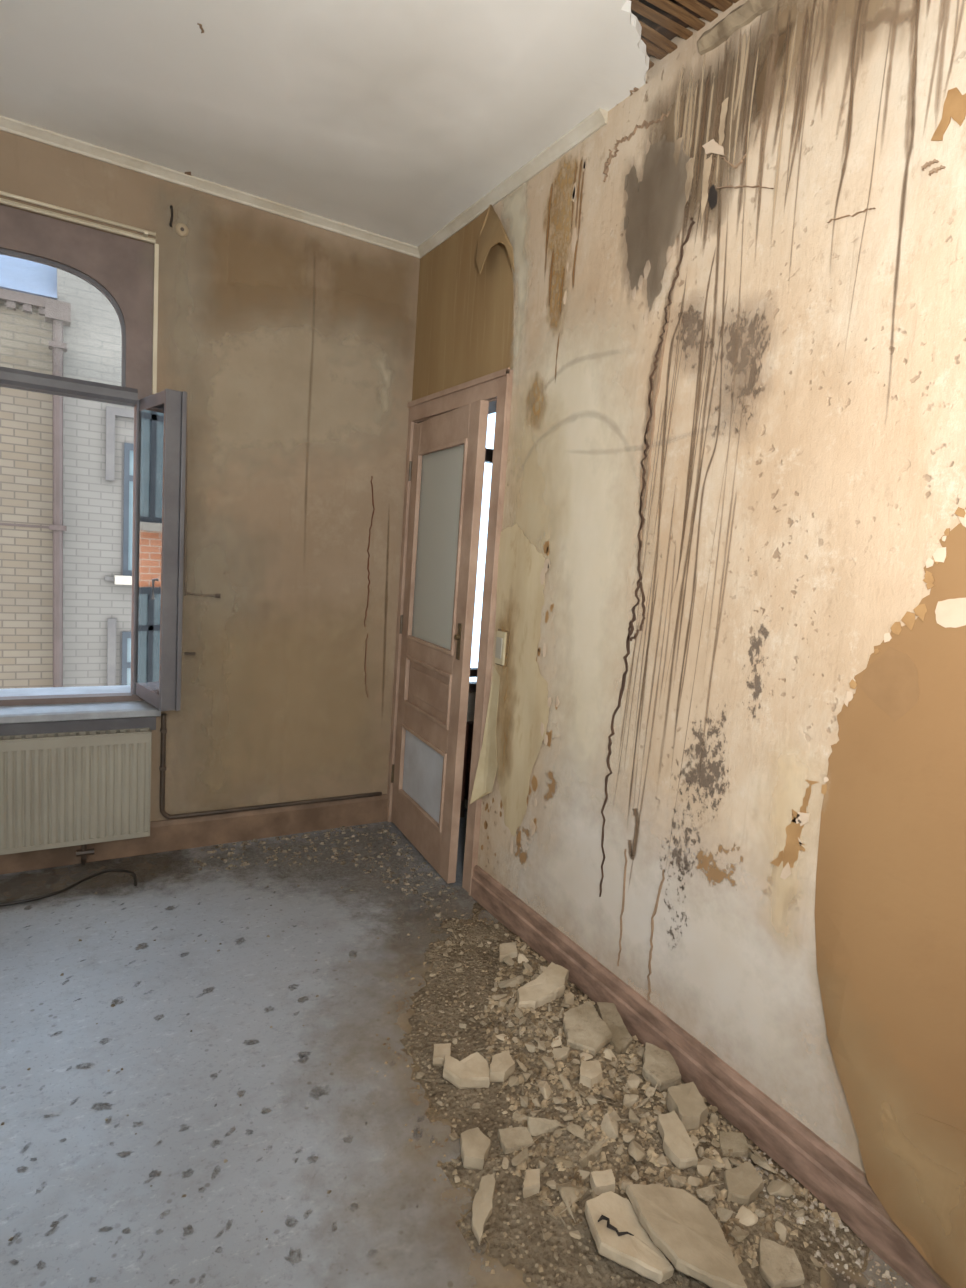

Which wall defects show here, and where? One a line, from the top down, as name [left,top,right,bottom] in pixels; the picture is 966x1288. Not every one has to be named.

peeling [931,87,966,141]
leakage [528,0,964,1084]
peeling [874,507,966,655]
peeling [844,679,857,707]
leakage [515,828,530,865]
peeling [770,777,829,880]